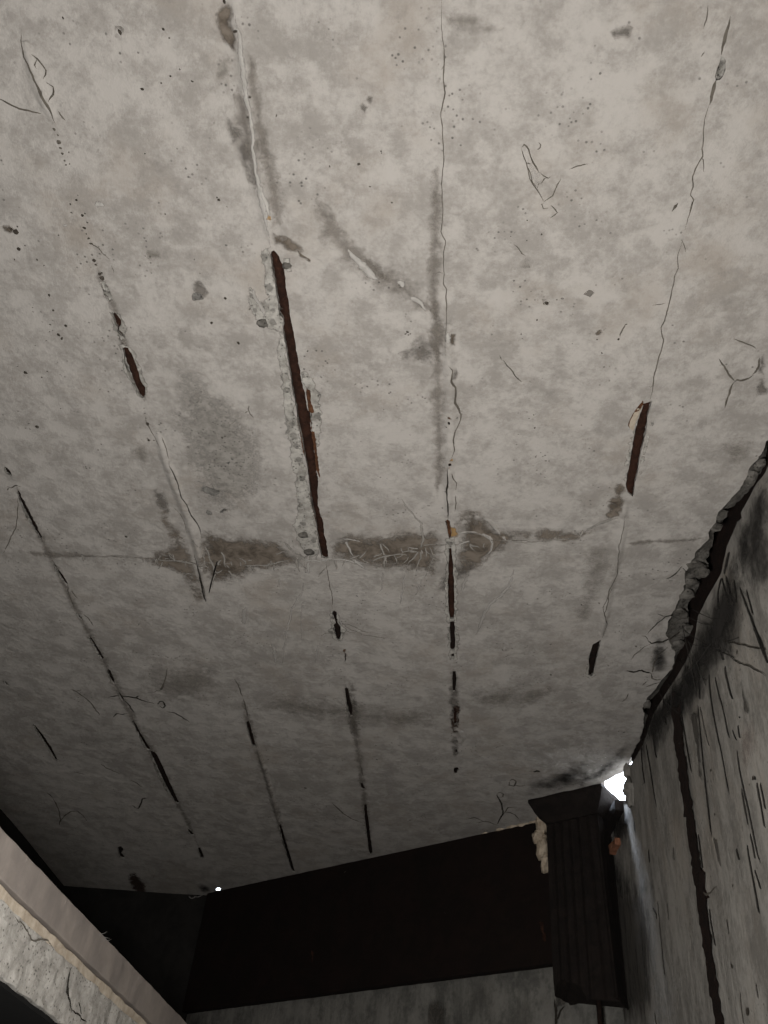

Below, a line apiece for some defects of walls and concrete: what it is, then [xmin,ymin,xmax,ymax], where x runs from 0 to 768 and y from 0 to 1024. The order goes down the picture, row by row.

crack [0,36,65,124]
crack [702,8,730,55]
crack [437,1,447,341]
crack [521,143,586,218]
damp [345,248,405,287]
damp [404,260,455,373]
crack [650,81,716,399]
spalling [249,249,329,559]
crack [446,368,462,516]
damp [104,494,446,603]
damp [456,484,624,575]
spalling [629,441,768,763]